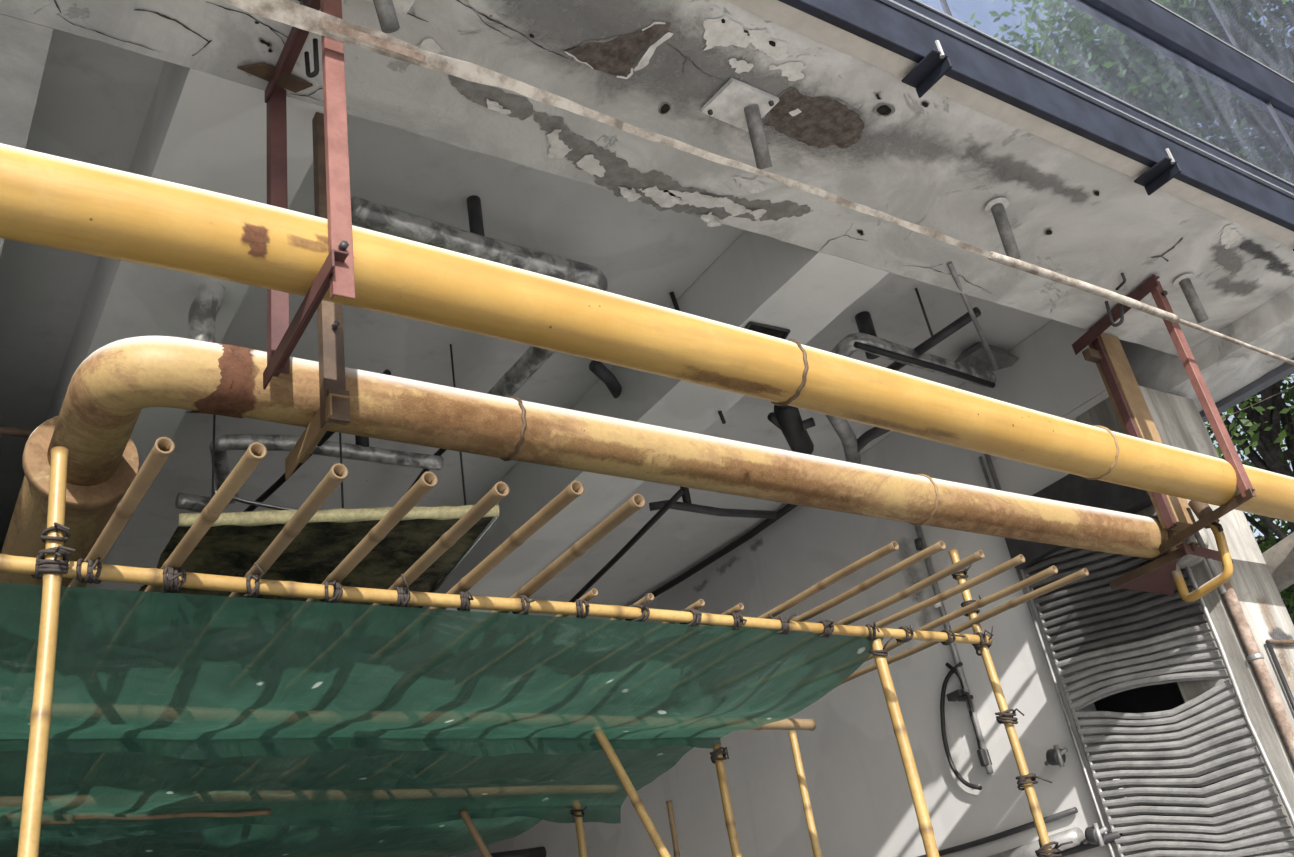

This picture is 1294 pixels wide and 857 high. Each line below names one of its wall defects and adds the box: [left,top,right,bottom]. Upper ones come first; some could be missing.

crack [54,0,155,51]
crack [134,9,212,56]
crack [207,2,288,45]
spalling [564,22,673,79]
damp [507,0,816,112]
spalling [703,16,895,148]
peeling [448,74,813,227]
damp [762,112,948,159]
damp [967,146,1088,202]